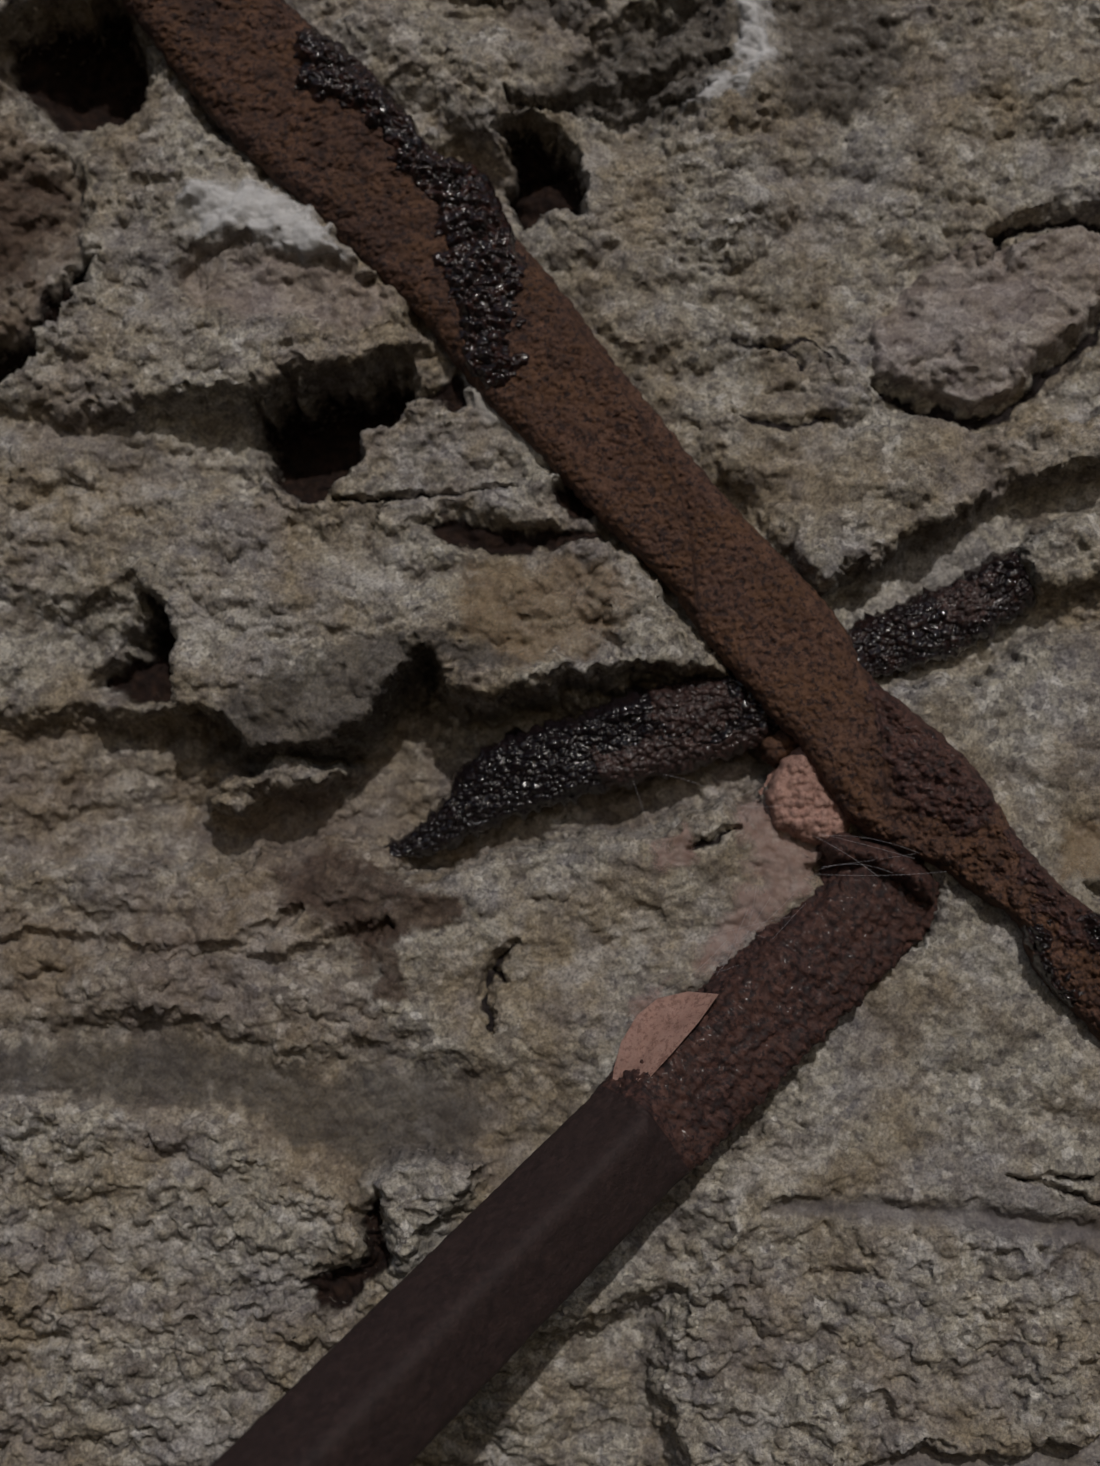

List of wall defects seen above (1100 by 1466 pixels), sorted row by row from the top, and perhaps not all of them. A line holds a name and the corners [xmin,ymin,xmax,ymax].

rust [586,675,799,790]
rust [274,848,461,1002]
rust [699,800,823,969]